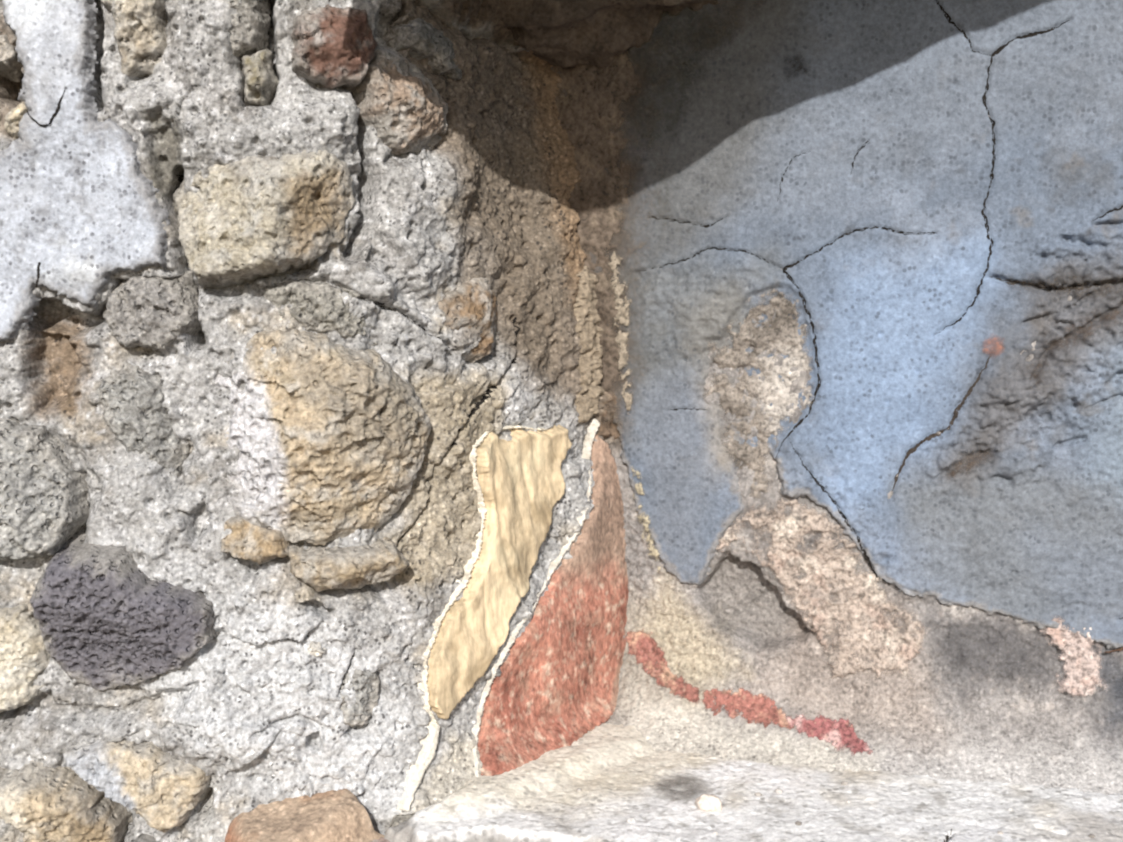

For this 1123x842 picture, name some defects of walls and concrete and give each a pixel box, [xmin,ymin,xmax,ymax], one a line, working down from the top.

crack [934,0,1110,335]
crack [1093,205,1123,221]
peeling [416,265,873,777]
crack [636,216,935,591]
flaking render [705,289,925,678]
crack [891,355,991,492]
flaking render [1040,618,1106,697]